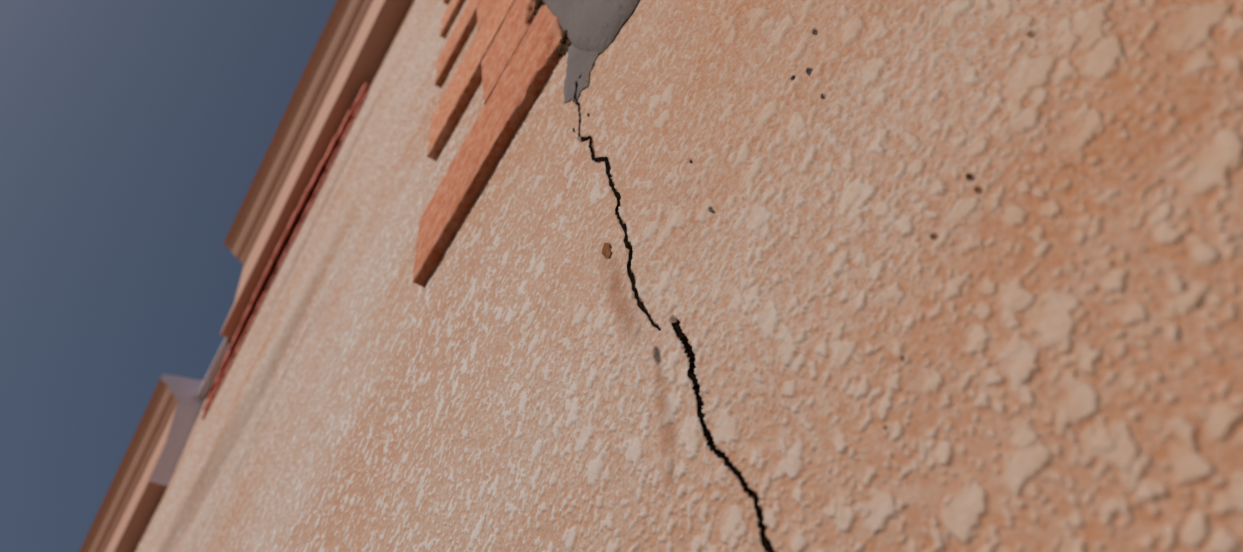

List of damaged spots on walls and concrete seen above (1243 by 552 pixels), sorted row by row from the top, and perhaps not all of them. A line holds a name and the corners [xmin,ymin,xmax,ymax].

crack [573,81,775,552]